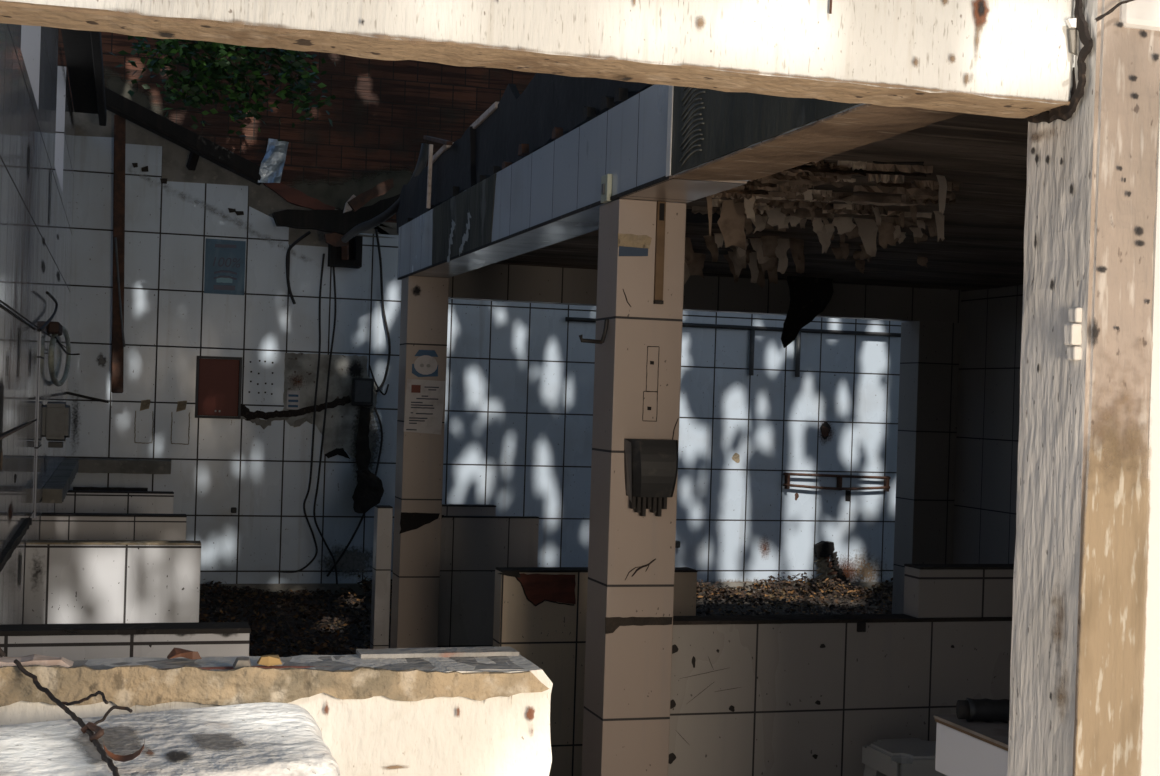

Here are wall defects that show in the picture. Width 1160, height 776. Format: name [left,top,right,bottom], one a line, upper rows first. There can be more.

corrosion [973,0,989,49]
crack [1027,0,1135,123]
peeling [684,159,960,288]
spalling [283,353,384,514]
spalling [399,512,444,534]
spalling [498,569,576,606]
spalling [0,657,549,708]
spalling [73,726,142,763]
spalling [192,733,245,749]